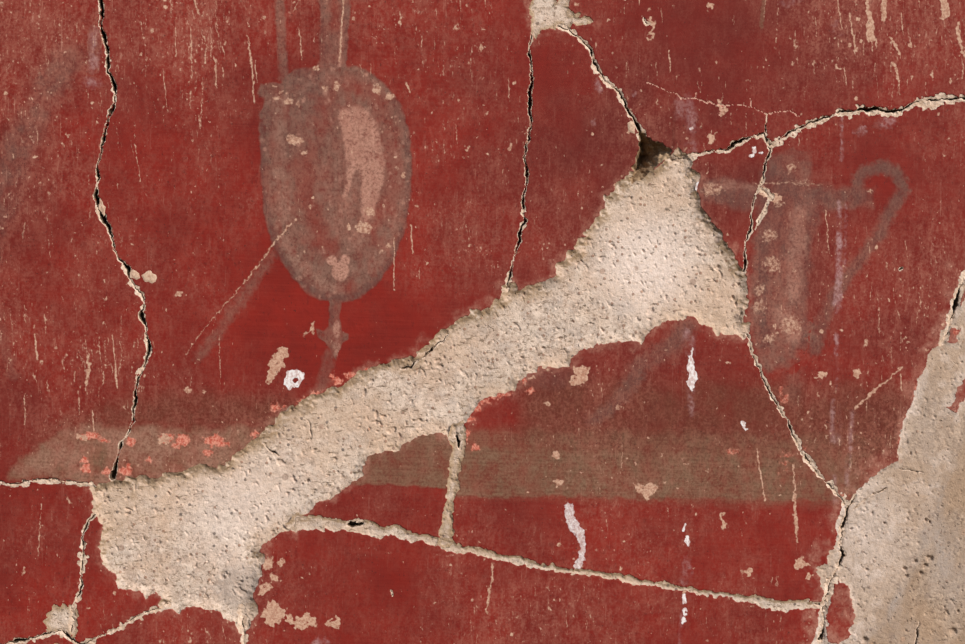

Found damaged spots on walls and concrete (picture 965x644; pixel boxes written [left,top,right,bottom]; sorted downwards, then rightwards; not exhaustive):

flaking render [43,603,79,644]
crack [0,0,157,487]
crack [5,513,172,644]
flaking render [73,148,751,634]
crack [505,33,534,293]
flaking render [529,0,593,39]
crack [555,24,647,140]
peeling [769,440,817,481]
crack [646,82,965,274]
crack [745,332,922,643]
flaking render [793,278,965,644]
crack [938,270,965,346]